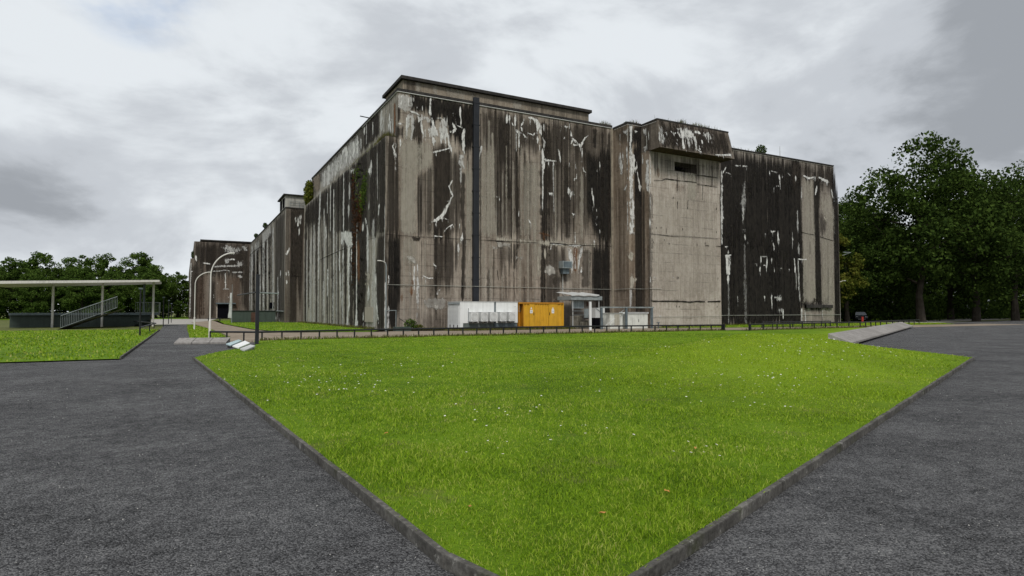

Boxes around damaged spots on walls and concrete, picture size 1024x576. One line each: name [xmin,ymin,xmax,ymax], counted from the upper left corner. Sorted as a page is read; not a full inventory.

leakage [189,94,840,329]
peeling [491,132,595,276]